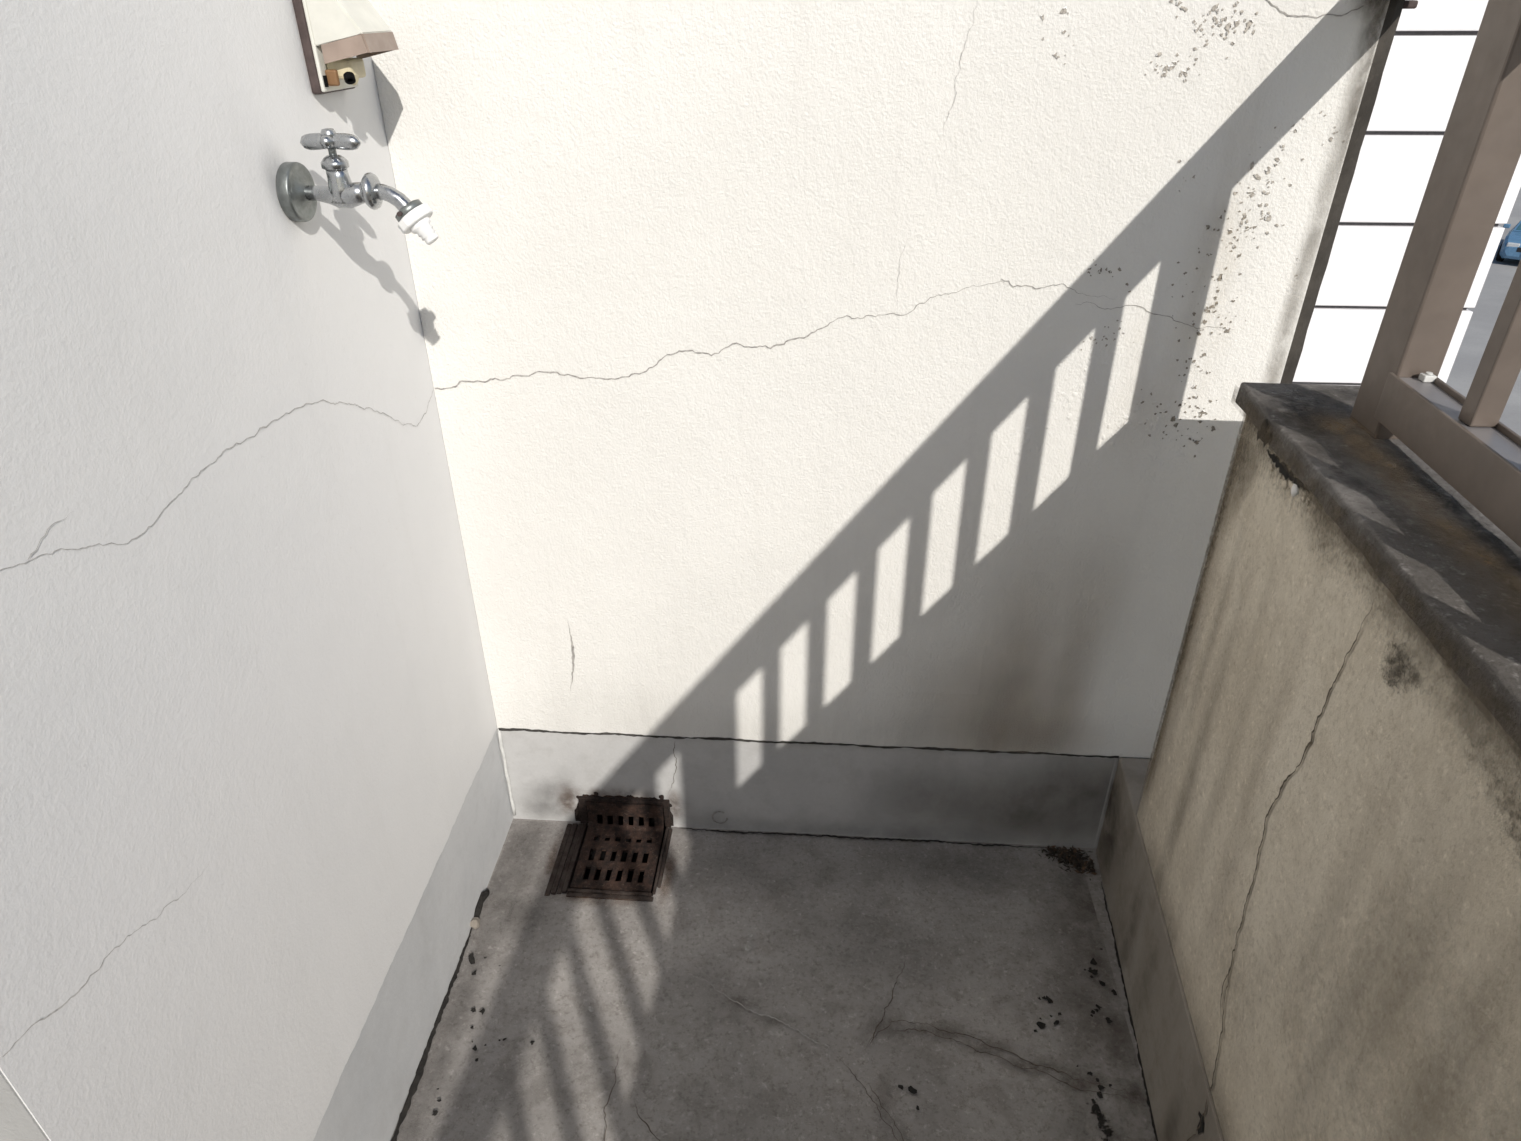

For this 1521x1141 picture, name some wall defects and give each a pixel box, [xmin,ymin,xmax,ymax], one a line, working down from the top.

crack [1267,0,1364,18]
crack [0,247,1231,571]
water stain [1383,643,1421,690]
rust [566,792,674,826]
crack [1187,604,1373,1141]
crack [2,875,201,1057]
crack [692,964,1140,1141]